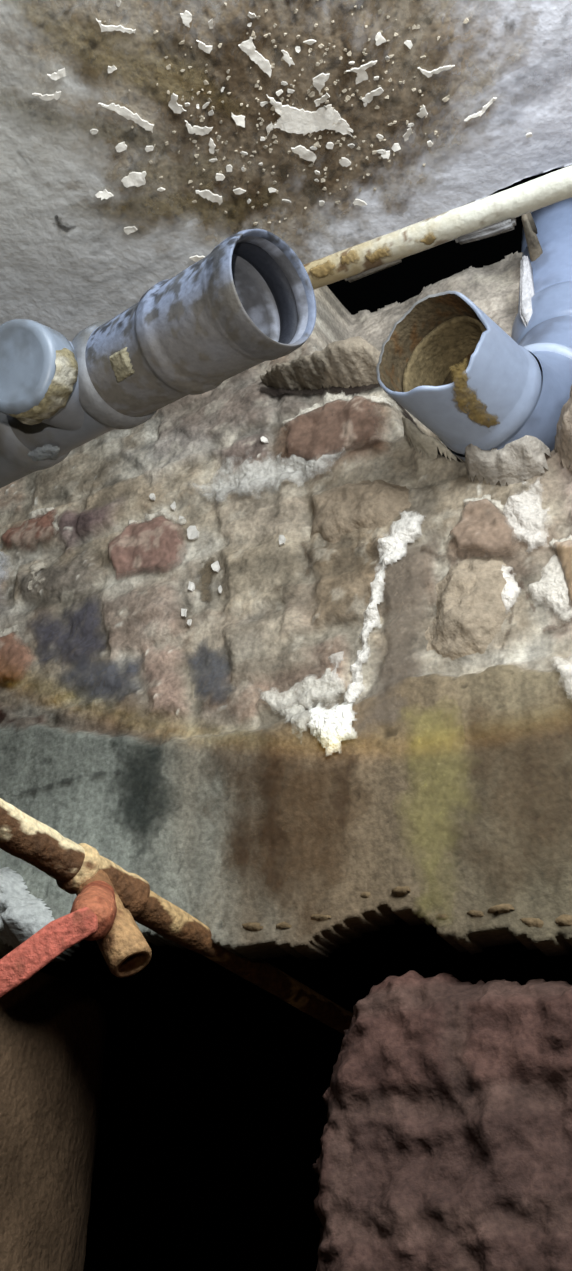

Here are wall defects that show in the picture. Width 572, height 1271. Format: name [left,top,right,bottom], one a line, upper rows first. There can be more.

peeling [32,68,66,101]
water stain [10,0,494,245]
peeling [95,9,455,226]
peeling [464,97,497,121]
spalling [455,218,516,244]
spalling [520,256,535,326]
spalling [283,392,391,461]
spalling [1,507,58,546]
spalling [108,493,200,576]
spalling [188,559,222,602]
spalling [450,495,515,555]
spalling [549,534,572,603]